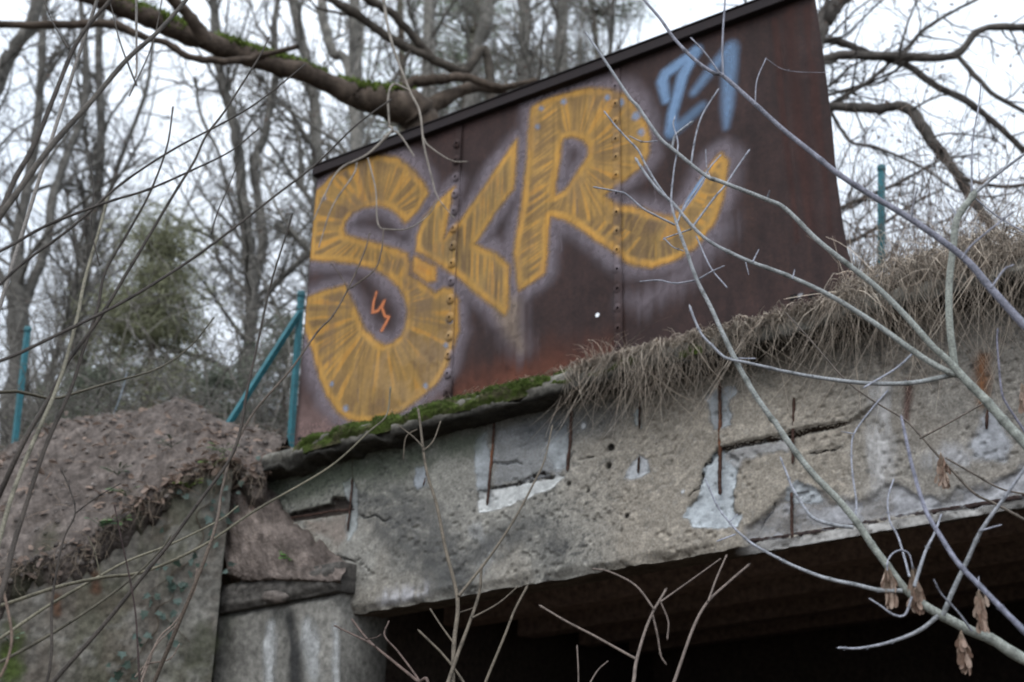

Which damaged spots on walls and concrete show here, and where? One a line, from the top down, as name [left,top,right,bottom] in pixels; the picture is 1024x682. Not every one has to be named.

corrosion [455,355,598,396]
corrosion [298,406,341,443]
spalling [290,458,358,540]
spalling [475,410,573,513]
spalling [626,456,650,479]
spalling [683,375,789,528]
crack [722,398,849,464]